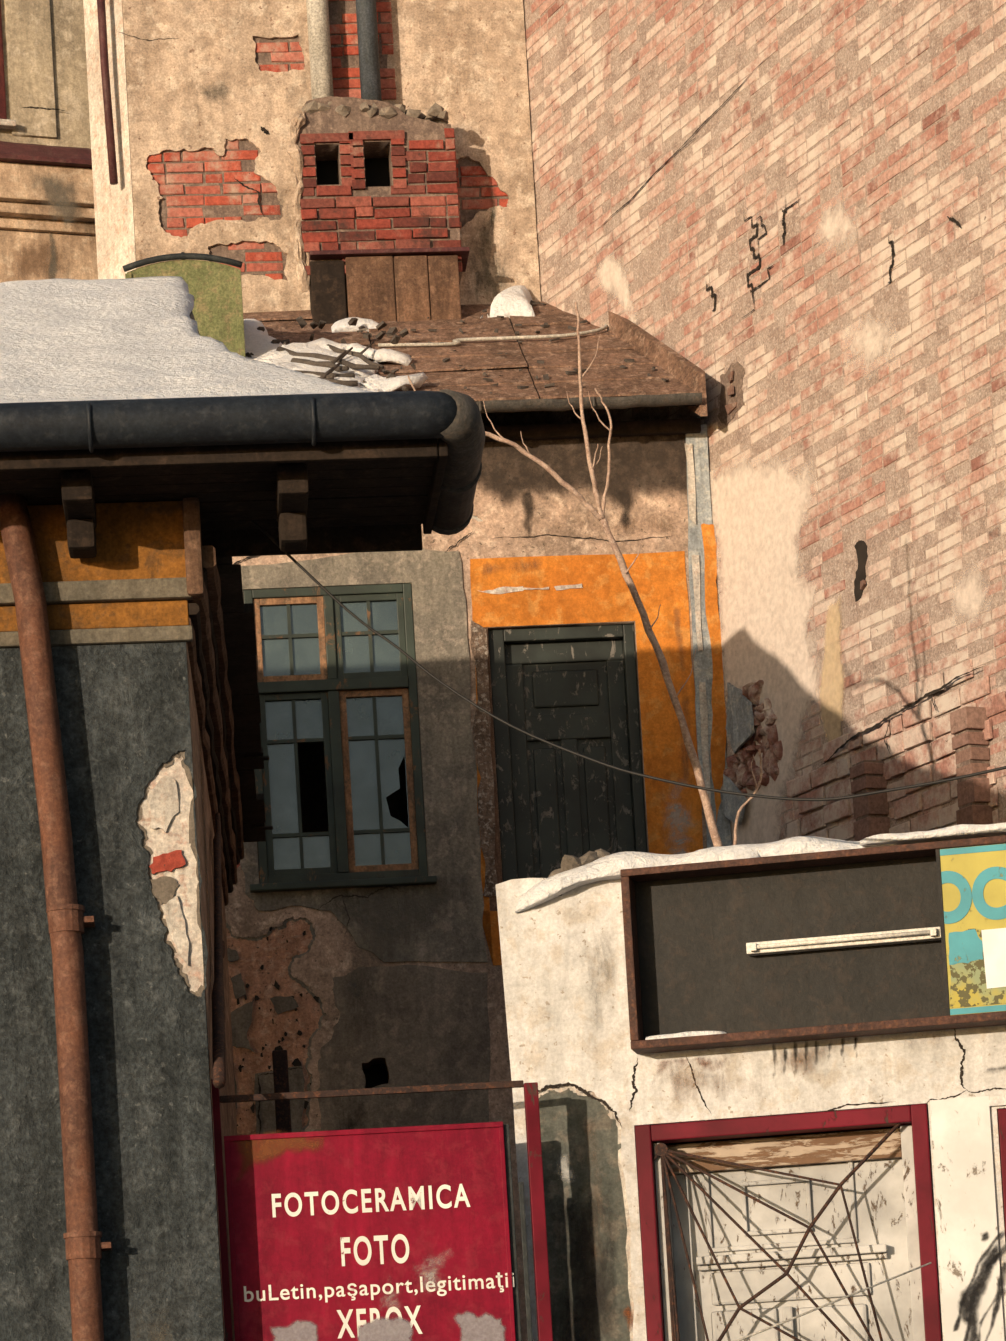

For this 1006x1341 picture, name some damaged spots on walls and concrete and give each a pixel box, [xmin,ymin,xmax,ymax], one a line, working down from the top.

spalling [146,111,311,293]
spalling [455,157,508,229]
crack [706,198,801,317]
crack [887,237,895,283]
spalling [854,540,868,602]
peeling [684,443,843,845]
peeling [135,751,205,997]
peeling [226,917,327,1135]
crack [686,1055,711,1113]
water stain [773,1038,857,1063]
crack [826,1029,1005,1111]
water stain [560,1159,572,1178]